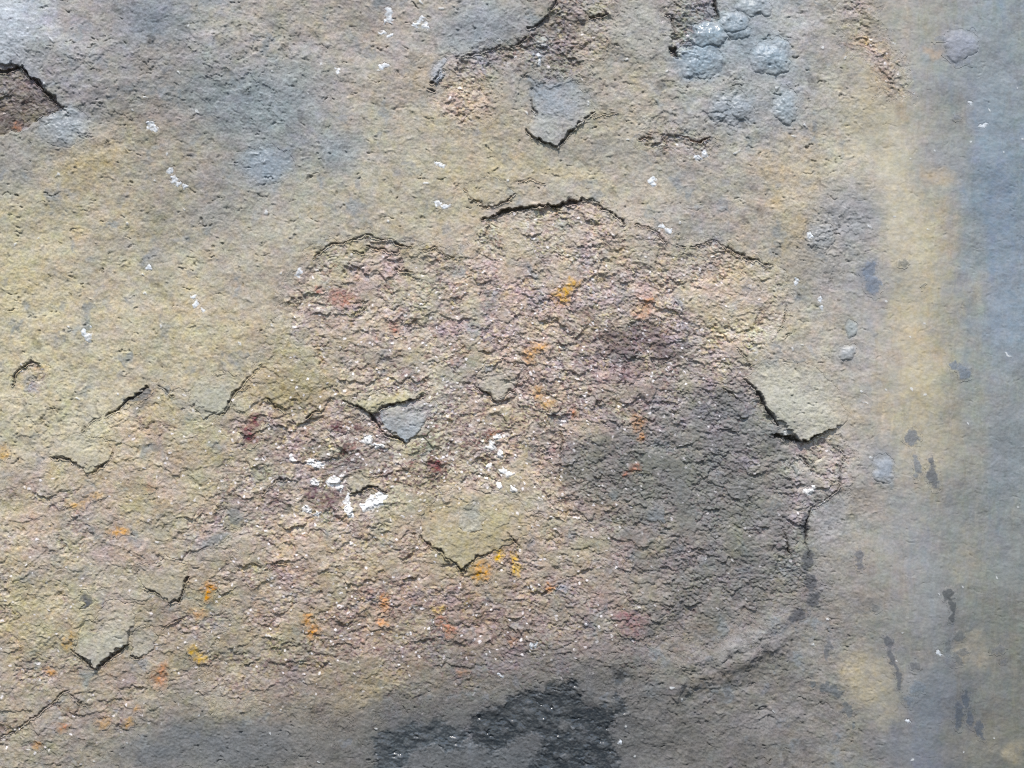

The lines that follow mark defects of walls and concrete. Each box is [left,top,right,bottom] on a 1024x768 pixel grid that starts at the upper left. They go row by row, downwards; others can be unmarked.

spalling [0,61,62,137]
crack [525,98,619,149]
crack [463,176,774,267]
rust [549,275,584,309]
water stain [858,257,885,300]
crack [221,363,424,444]
spalling [0,176,859,768]
crack [721,347,846,559]
water stain [901,426,942,494]
rust [468,548,523,584]
water stain [940,585,971,668]
water stain [881,631,926,710]